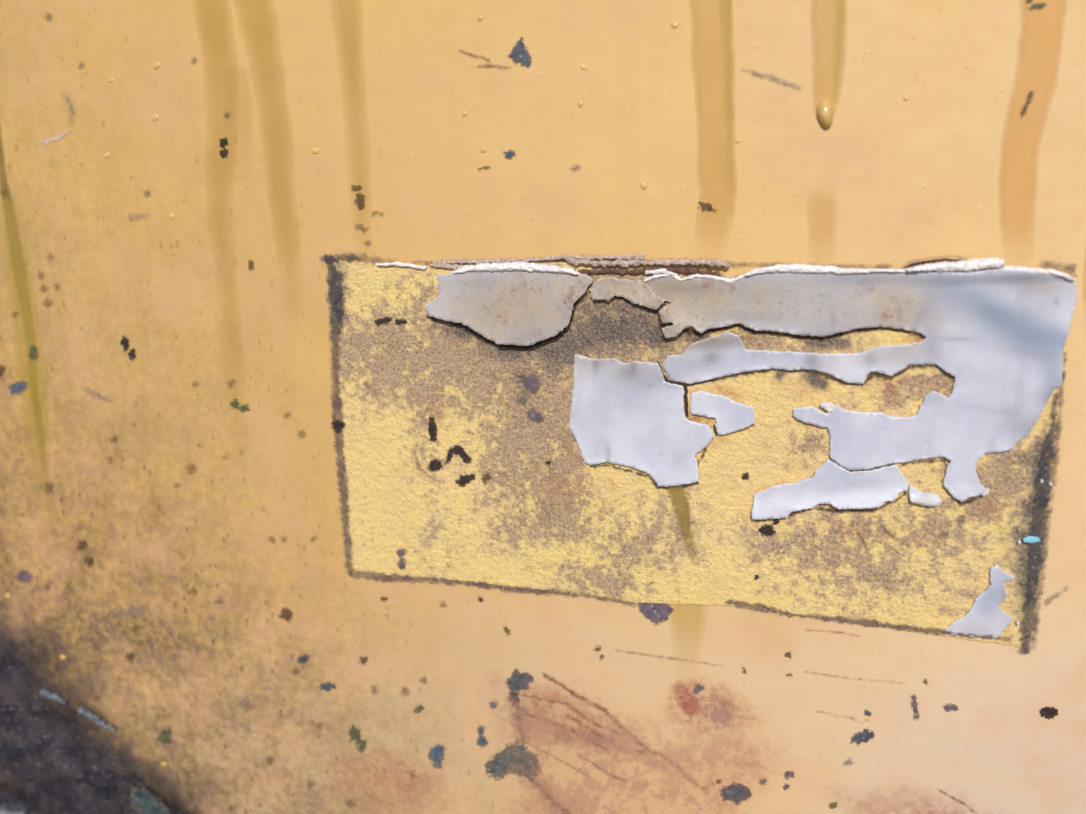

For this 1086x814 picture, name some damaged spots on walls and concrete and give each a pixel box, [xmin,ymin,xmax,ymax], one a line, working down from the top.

water stain [816,0,840,129]
water stain [1024,0,1061,89]
spalling [374,316,407,326]
spalling [330,420,345,433]
peeling [424,256,1078,536]
spalling [396,548,407,569]
peeling [638,603,673,625]
peeling [944,564,1015,639]